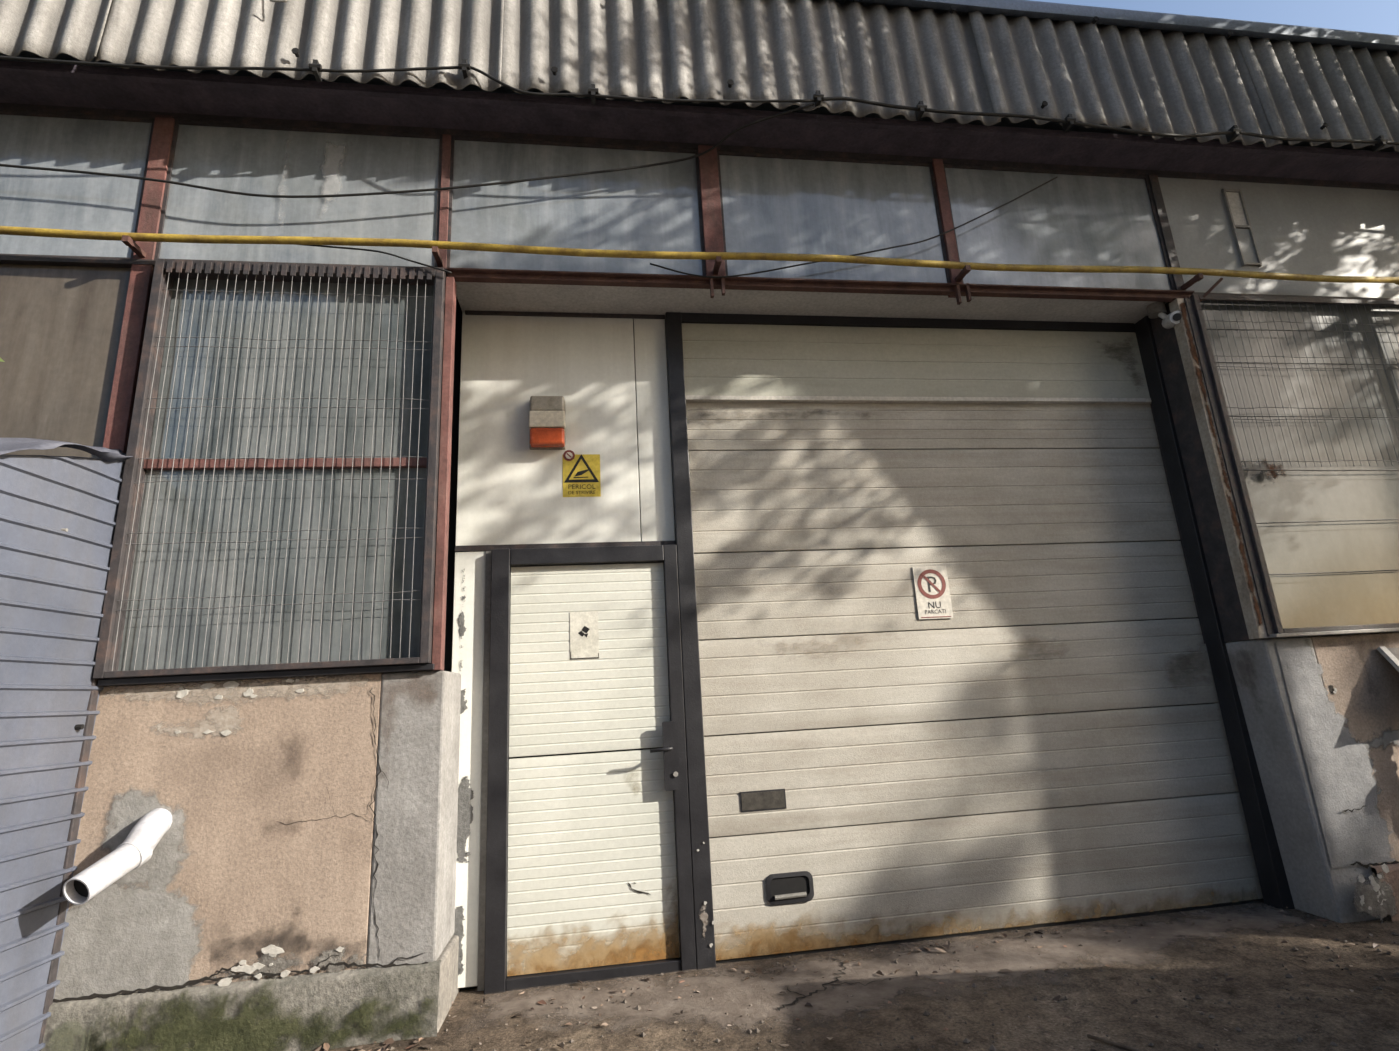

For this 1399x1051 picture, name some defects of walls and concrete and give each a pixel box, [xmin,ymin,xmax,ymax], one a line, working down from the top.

rust [1180,303,1286,626]
peeling [458,569,466,671]
peeling [103,674,369,739]
peeling [460,689,468,714]
crack [53,687,428,1003]
peeling [457,776,474,863]
flaking render [1350,864,1398,923]
flaking render [213,945,366,986]
peeling [453,906,465,975]
rust [507,914,680,976]
rust [715,903,1123,961]